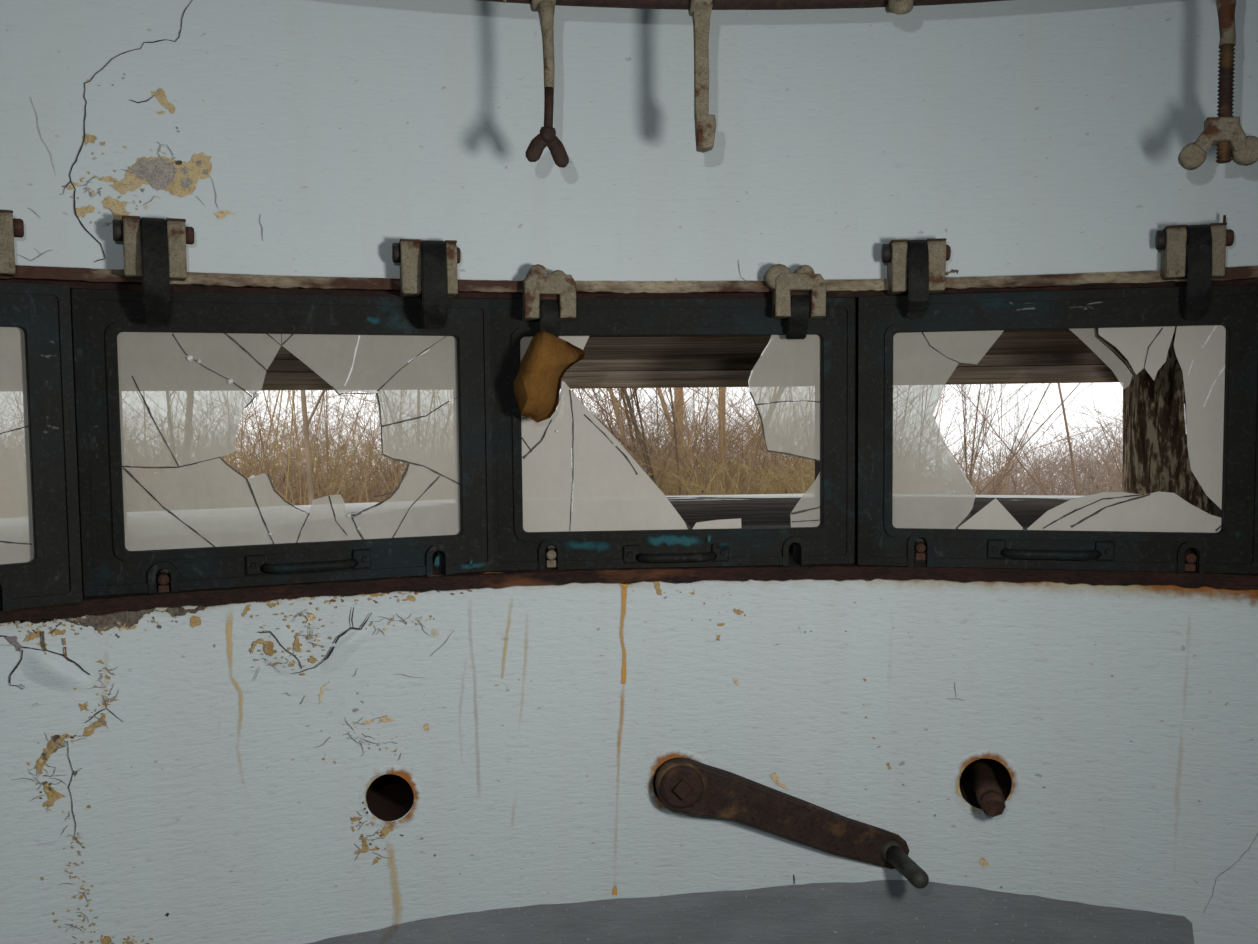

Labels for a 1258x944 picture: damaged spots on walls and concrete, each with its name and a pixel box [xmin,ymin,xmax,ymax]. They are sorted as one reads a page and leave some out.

crack [30,1,192,262]
peeling [151,88,180,133]
peeling [60,134,212,226]
corrosion [226,619,242,710]
crack [261,607,372,704]
peeling [242,589,472,680]
corrosion [620,583,628,723]
corrosion [1024,581,1258,599]
crack [0,627,122,848]
peeling [27,660,153,944]
corrosion [390,771,418,822]
corrosion [654,754,690,772]